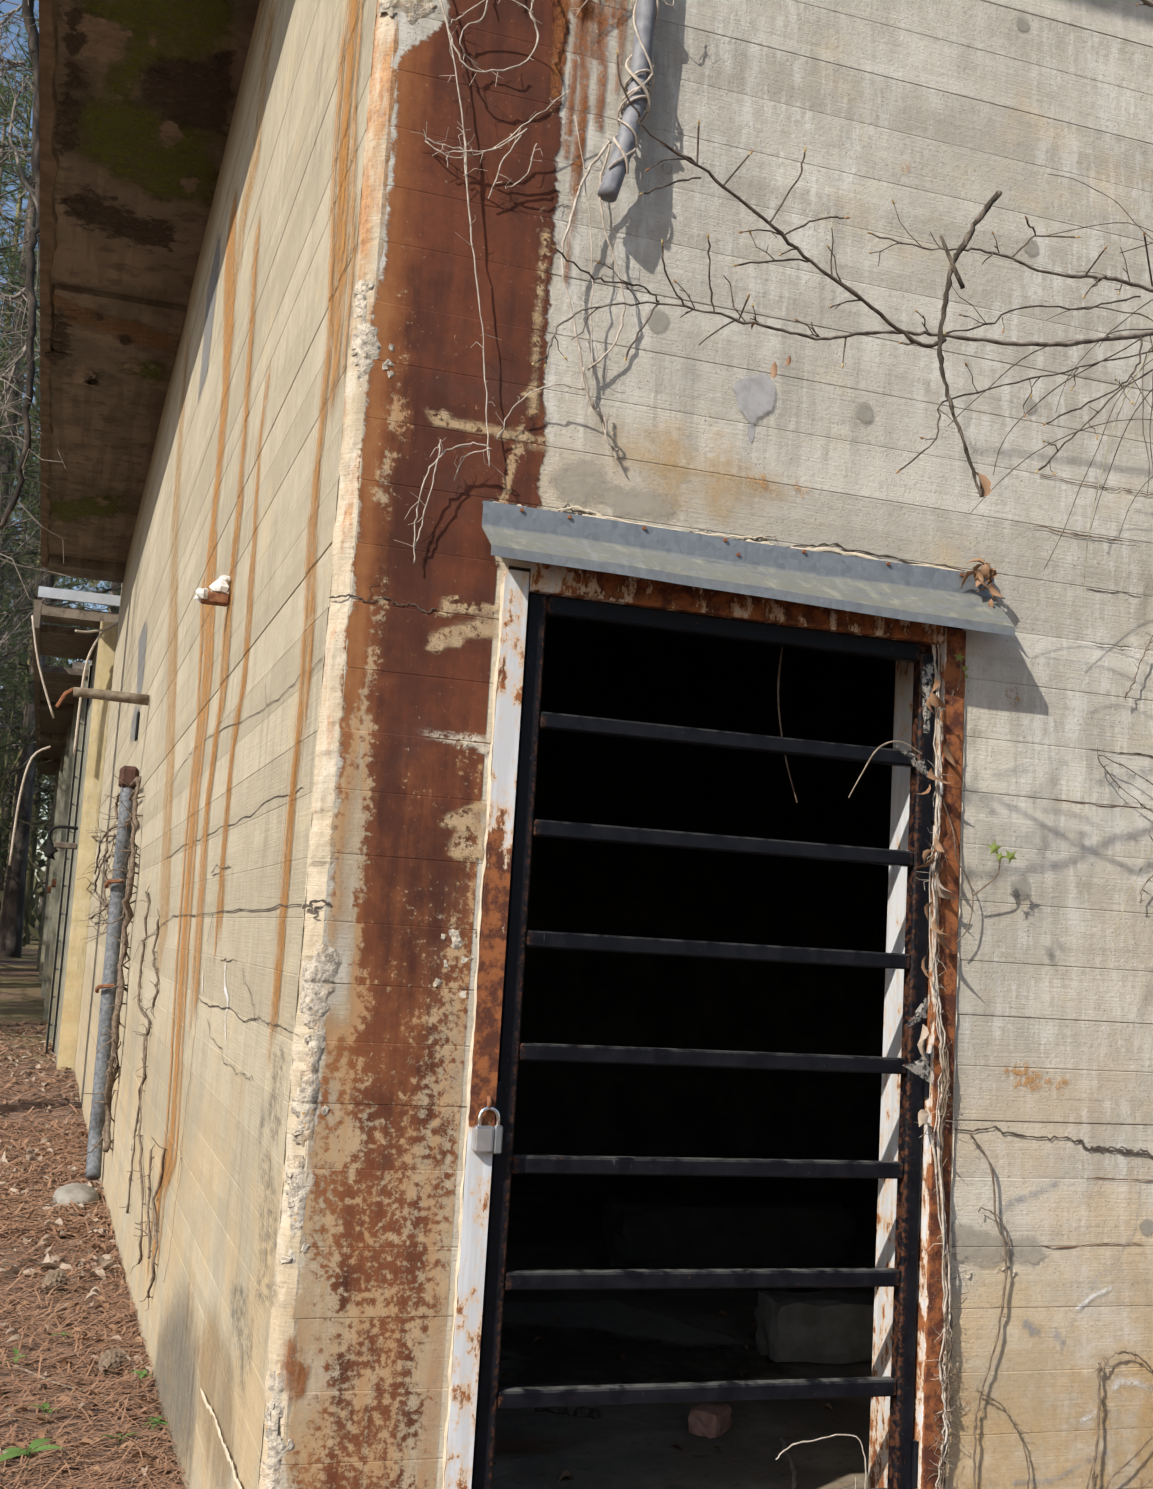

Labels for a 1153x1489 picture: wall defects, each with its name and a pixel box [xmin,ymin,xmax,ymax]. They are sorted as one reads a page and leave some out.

leakage [198,235,220,400]
crack [329,583,438,613]
corrosion [147,192,270,1273]
spalling [230,0,438,1489]
corrosion [270,0,627,1489]
peeling [432,733,490,754]
peeling [441,801,486,861]
spalling [433,927,477,987]
corrosion [1005,1065,1068,1090]
crack [914,1122,1153,1182]